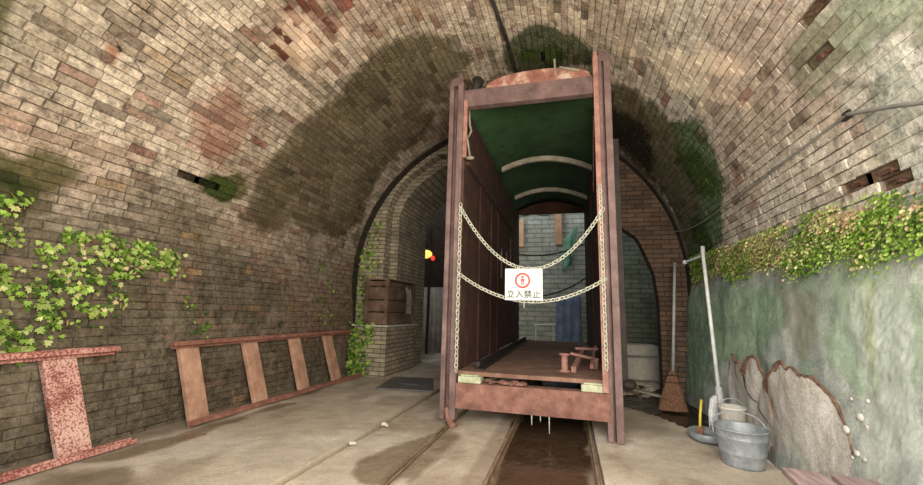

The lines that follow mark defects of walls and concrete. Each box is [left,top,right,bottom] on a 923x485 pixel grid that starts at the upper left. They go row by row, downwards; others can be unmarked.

spalling [807,1,829,17]
water stain [242,31,473,243]
spalling [847,168,914,188]